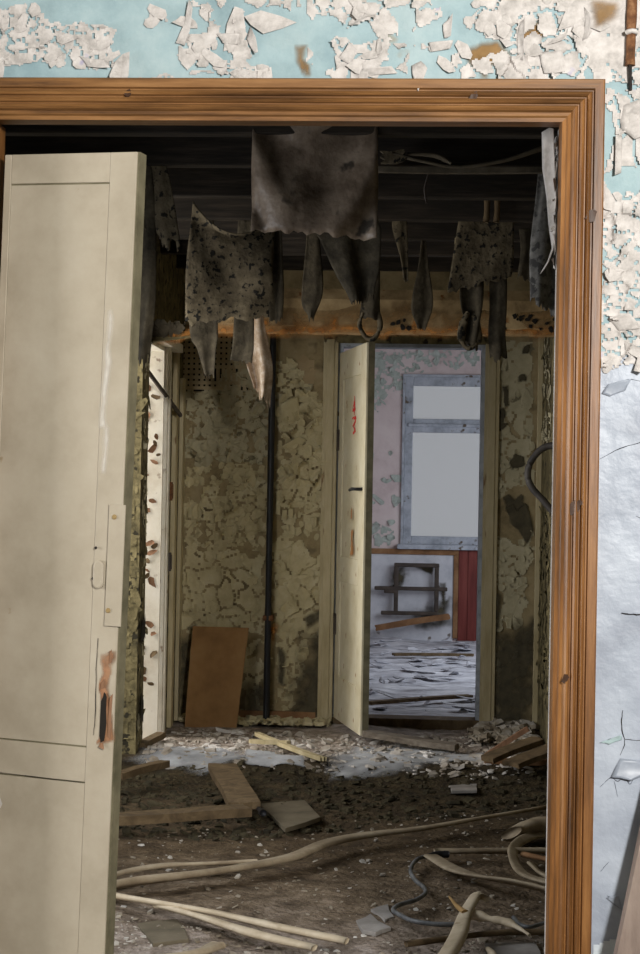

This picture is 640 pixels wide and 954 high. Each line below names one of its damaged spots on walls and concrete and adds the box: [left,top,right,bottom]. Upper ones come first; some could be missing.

peeling [0,2,175,78]
peeling [144,0,640,373]
rust [264,319,458,338]
peeling [374,349,480,412]
crack [602,379,638,396]
peeling [181,354,328,711]
peeling [496,337,551,719]
crack [600,710,640,796]
spalling [593,939,616,954]